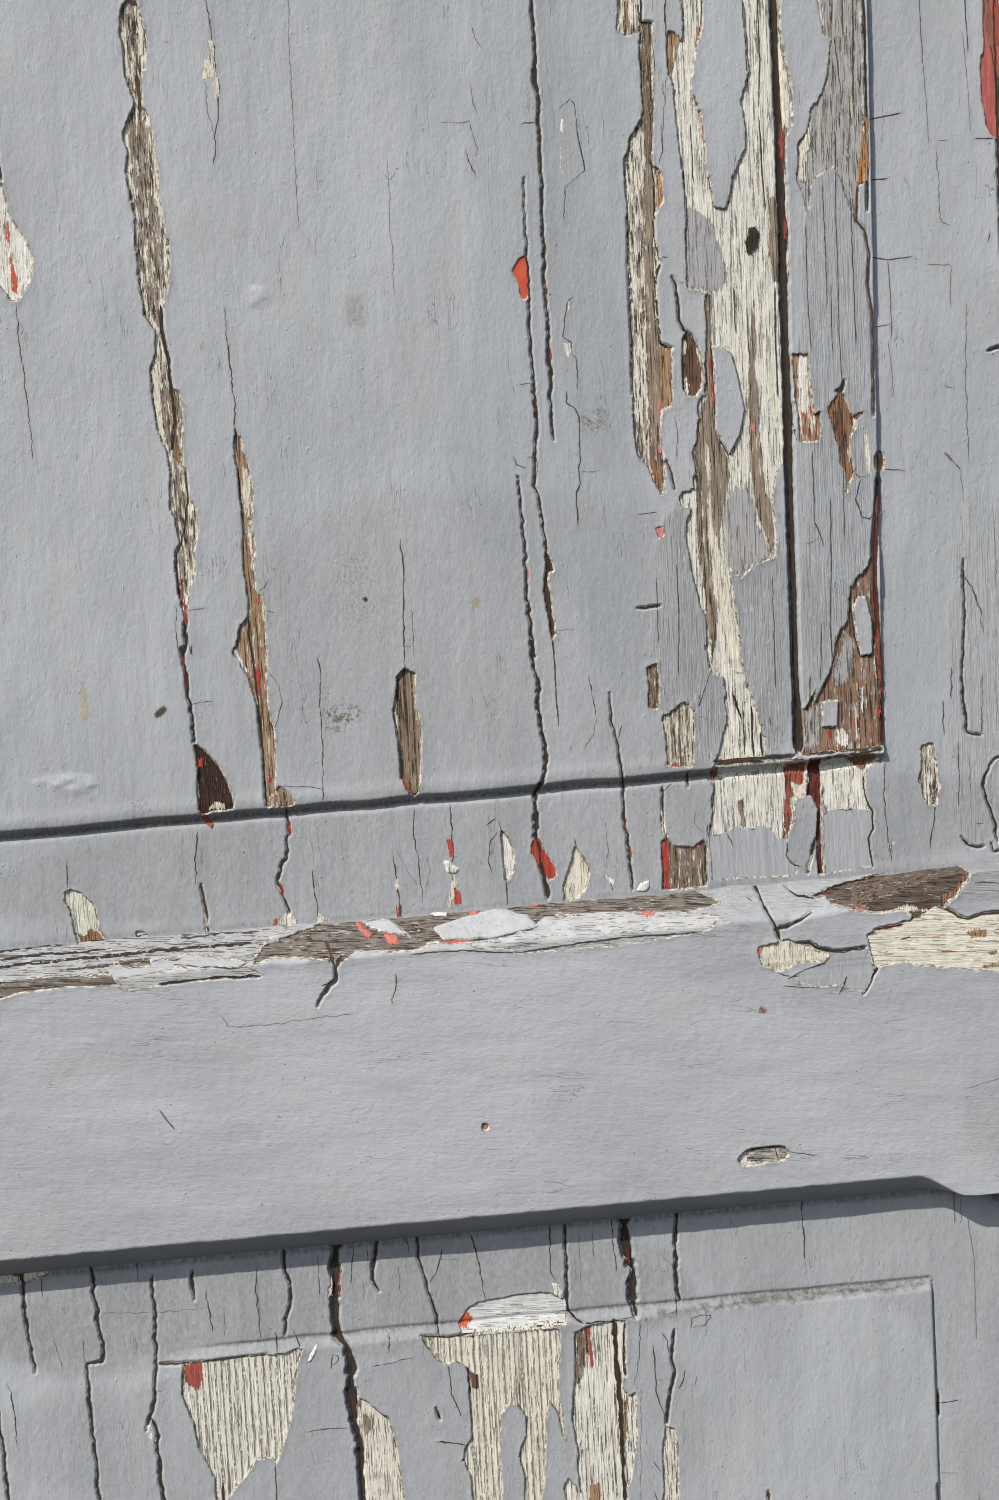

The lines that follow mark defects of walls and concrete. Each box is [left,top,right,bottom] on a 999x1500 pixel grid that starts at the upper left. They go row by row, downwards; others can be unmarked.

peeling [0,0,999,998]
crack [513,0,598,898]
crack [584,0,999,892]
crack [746,842,839,940]
crack [751,1146,814,1158]
peeling [159,1344,317,1500]
crack [0,1235,486,1500]
peeling [355,1395,404,1500]
peeling [421,1283,636,1500]
peeling [653,1330,685,1500]